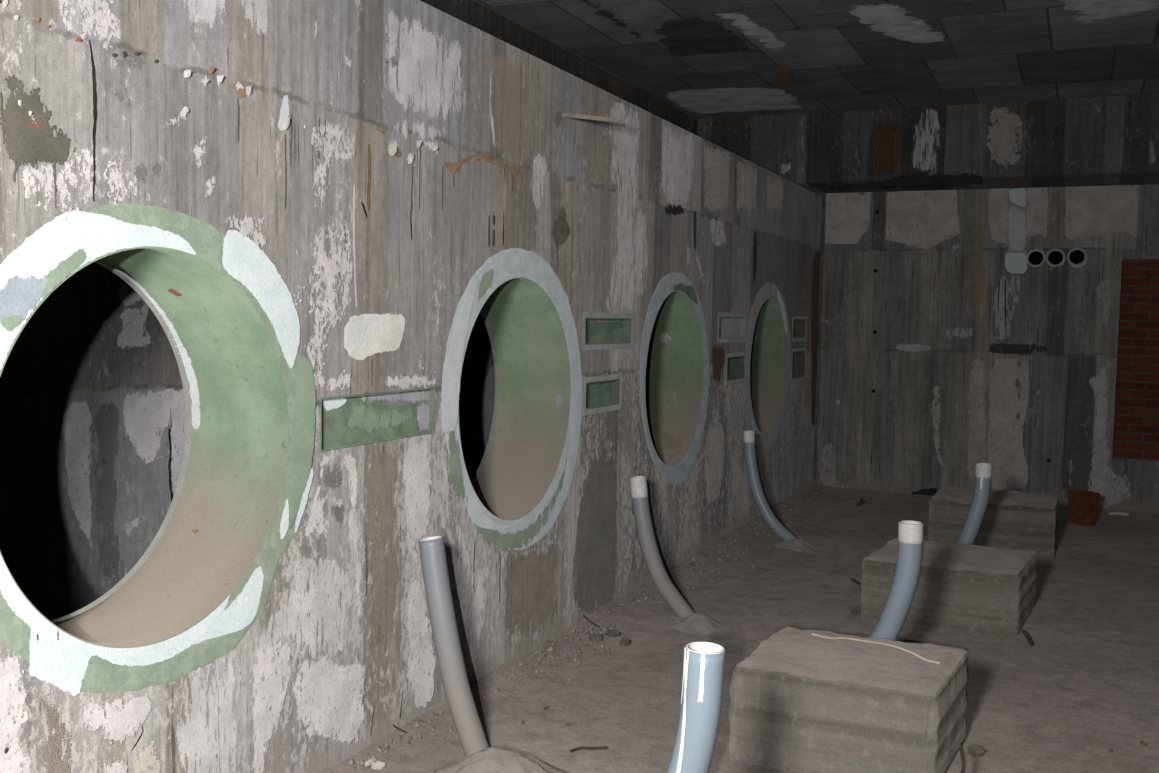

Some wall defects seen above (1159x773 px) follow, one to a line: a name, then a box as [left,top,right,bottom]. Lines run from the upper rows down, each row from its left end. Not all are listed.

leakage [0,74,76,208]
crack [89,40,97,201]
peeling [384,6,468,210]
rust [444,152,520,191]
peeling [489,71,497,148]
peeling [531,153,547,210]
peeling [911,108,940,172]
peeling [986,106,1022,165]
crack [166,409,174,502]